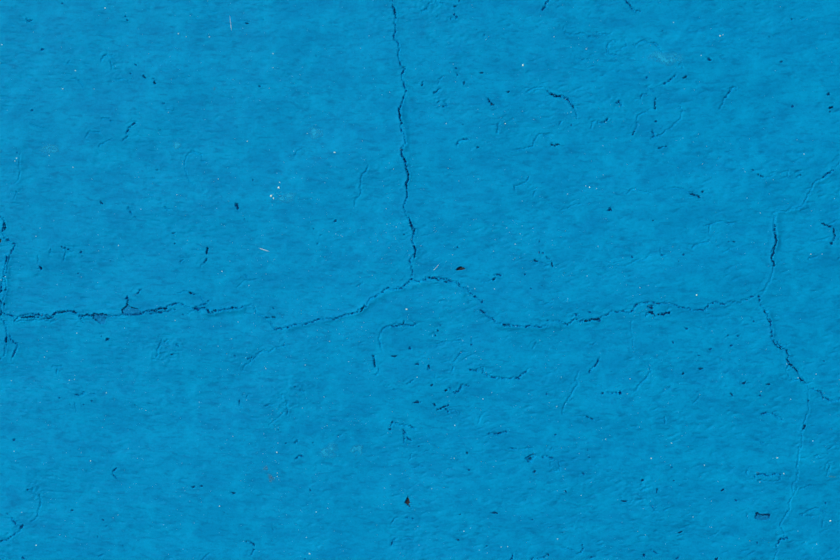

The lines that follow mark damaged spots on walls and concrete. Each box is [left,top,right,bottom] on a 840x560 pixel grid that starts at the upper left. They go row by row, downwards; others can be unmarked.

crack [0,0,840,368]
crack [385,360,534,450]
crack [584,352,627,399]
crack [0,512,28,547]